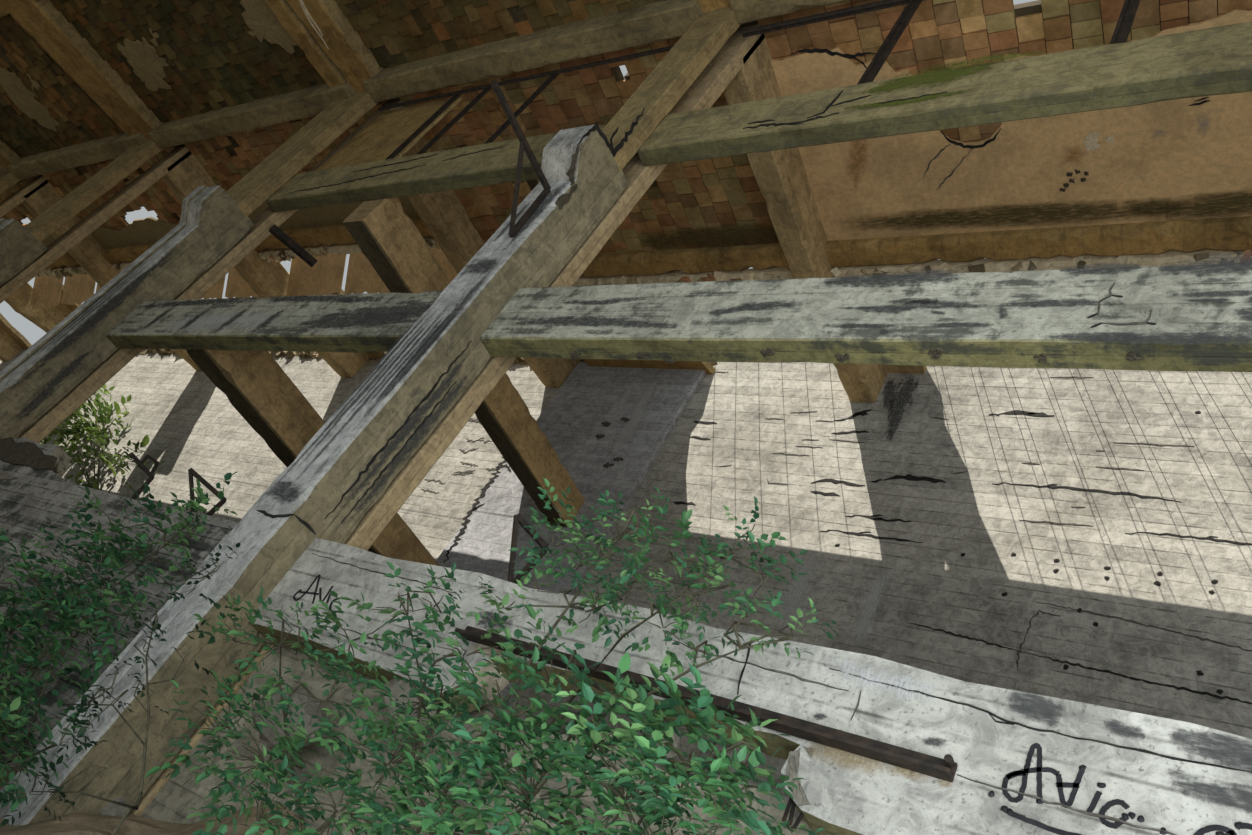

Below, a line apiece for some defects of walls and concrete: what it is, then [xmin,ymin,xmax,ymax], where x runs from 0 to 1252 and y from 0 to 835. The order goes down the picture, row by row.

peeling [240,0,297,54]
peeling [299,0,329,50]
peeling [0,66,61,132]
peeling [117,28,172,92]
crack [743,48,947,129]
crack [577,108,645,157]
water stain [862,192,1252,228]
crack [1087,282,1156,328]
crack [257,341,511,595]
crack [906,601,1252,705]
crack [673,640,1250,772]
crack [957,774,1177,835]